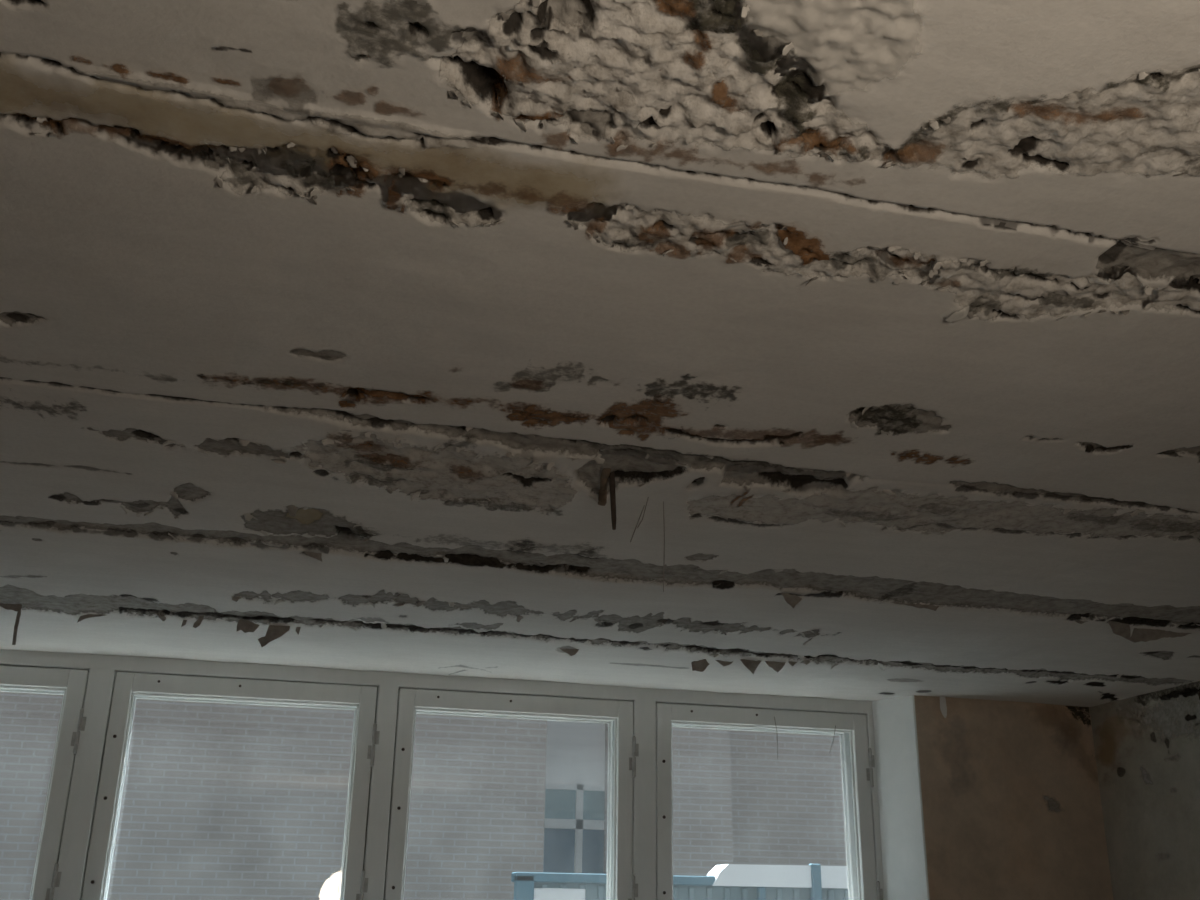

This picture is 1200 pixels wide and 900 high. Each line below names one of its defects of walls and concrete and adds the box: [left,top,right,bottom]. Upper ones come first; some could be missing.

flaking render [439,0,899,168]
damp [0,72,591,208]
peeling [290,349,345,360]
corrosion [197,374,687,441]
flaking render [849,404,951,436]
peeling [49,492,105,505]
peeling [120,483,210,519]
flaking render [88,427,705,512]
flaking render [721,463,848,507]
peeling [1080,442,1133,453]
flaking render [241,505,369,542]
peeling [232,589,823,645]